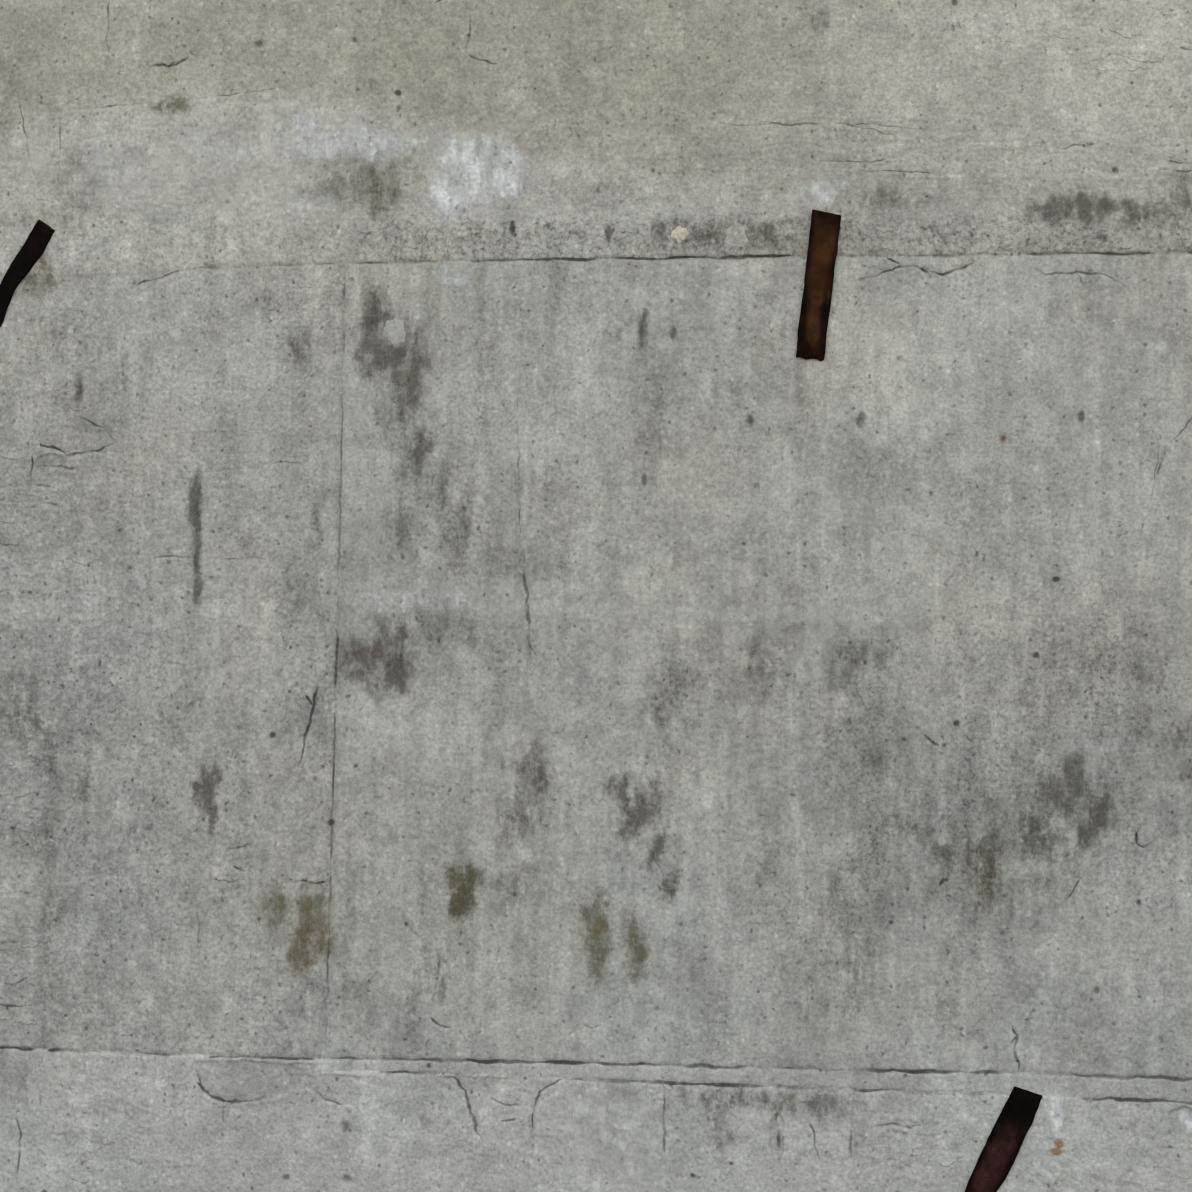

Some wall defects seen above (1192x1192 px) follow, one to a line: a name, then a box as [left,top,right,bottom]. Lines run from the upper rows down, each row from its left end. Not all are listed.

corrosion [807,229,835,339]
water stain [357,294,428,417]
water stain [413,433,432,467]
water stain [189,473,202,598]
water stain [340,627,411,693]
water stain [607,776,656,834]
water stain [1046,758,1086,814]
water stain [1078,795,1109,846]
corrosion [973,1131,1016,1192]